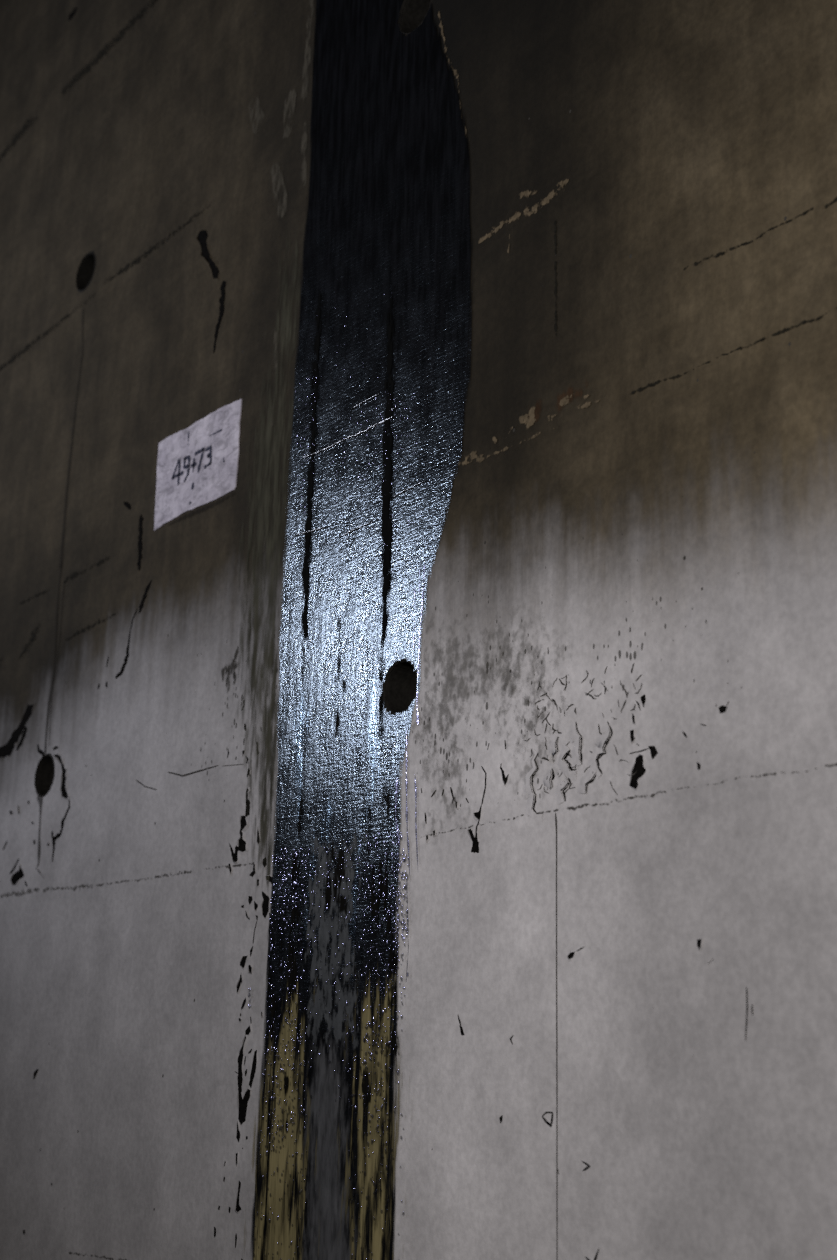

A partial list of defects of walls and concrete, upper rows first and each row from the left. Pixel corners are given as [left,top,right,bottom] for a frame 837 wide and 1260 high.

crack [196,230,226,353]
crack [98,501,152,689]
damp [221,0,599,1260]
crack [37,744,71,862]
spalling [421,766,486,853]
peeling [523,664,658,825]
spalling [218,700,272,1214]